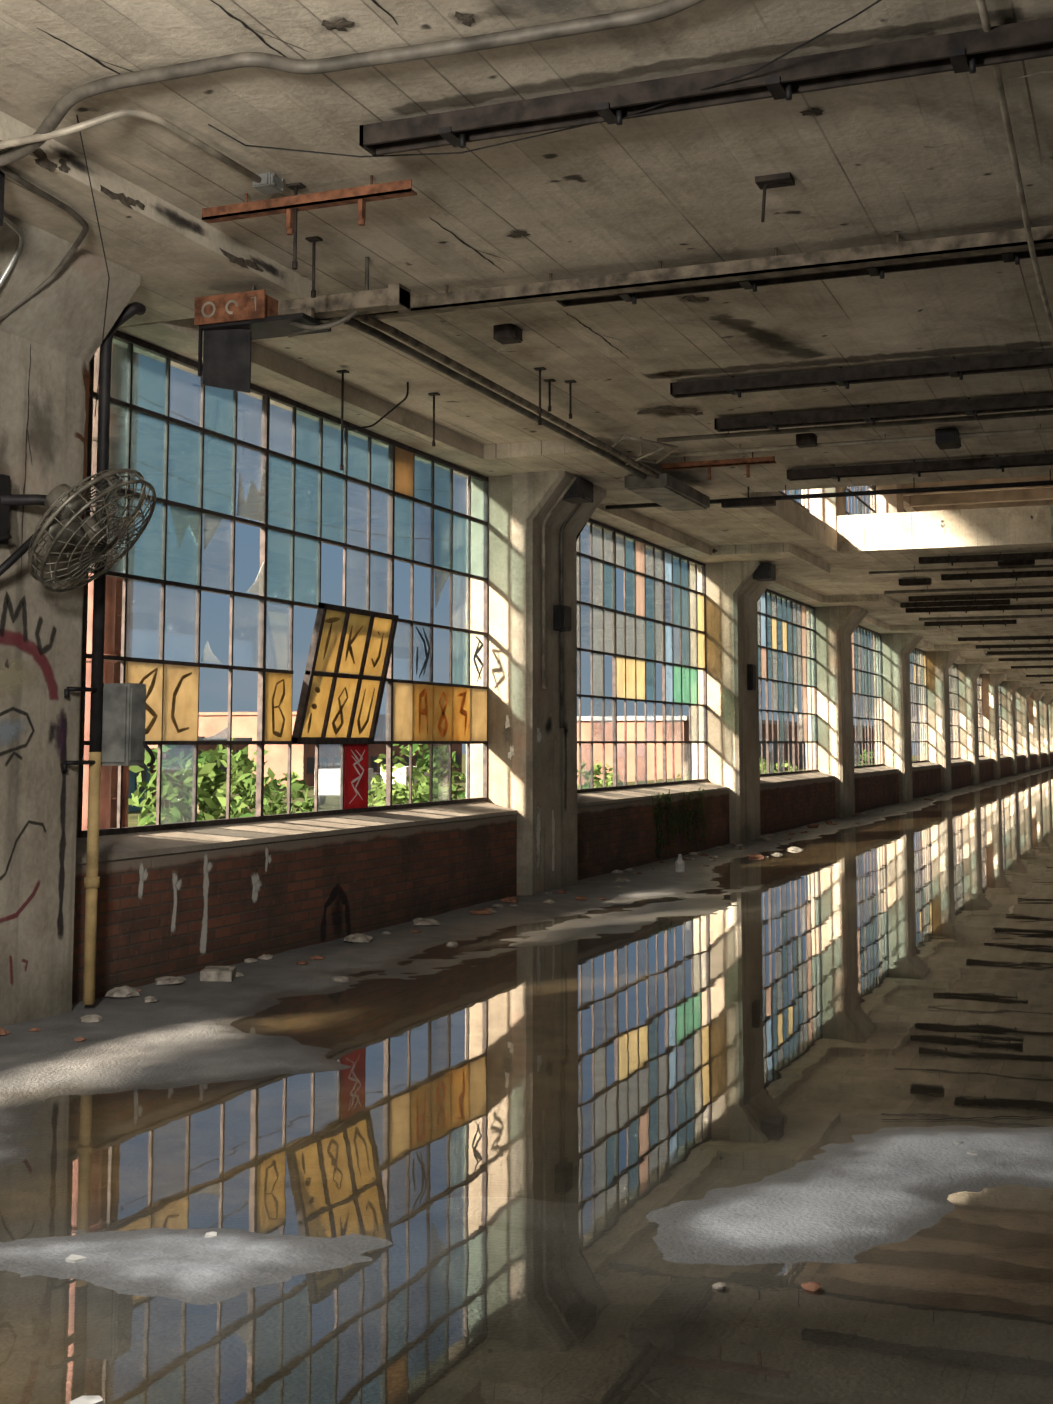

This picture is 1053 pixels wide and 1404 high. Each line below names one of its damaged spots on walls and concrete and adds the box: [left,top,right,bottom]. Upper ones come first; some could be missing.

crack [210,0,308,57]